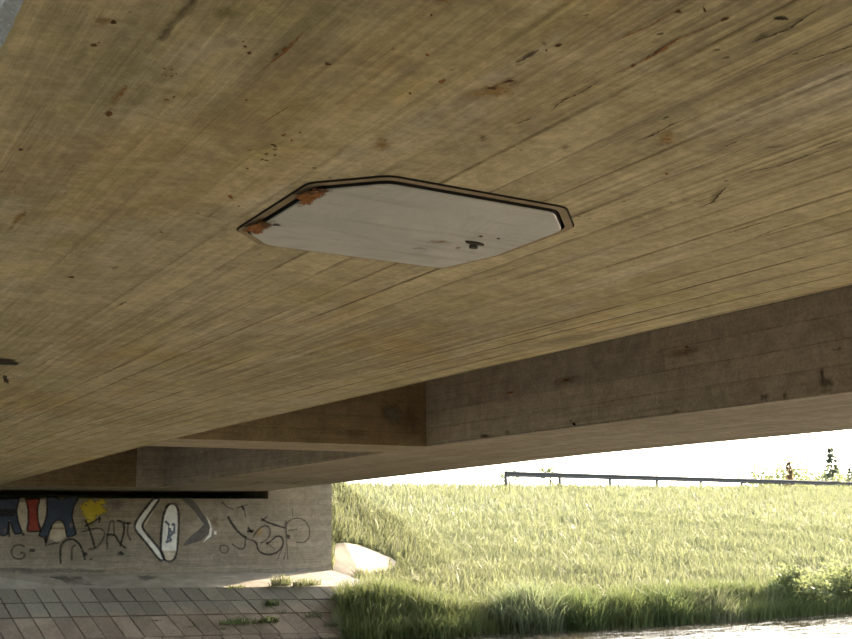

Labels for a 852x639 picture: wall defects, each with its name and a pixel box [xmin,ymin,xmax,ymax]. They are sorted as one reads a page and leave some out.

corrosion [295,189,332,207]
corrosion [243,220,281,234]